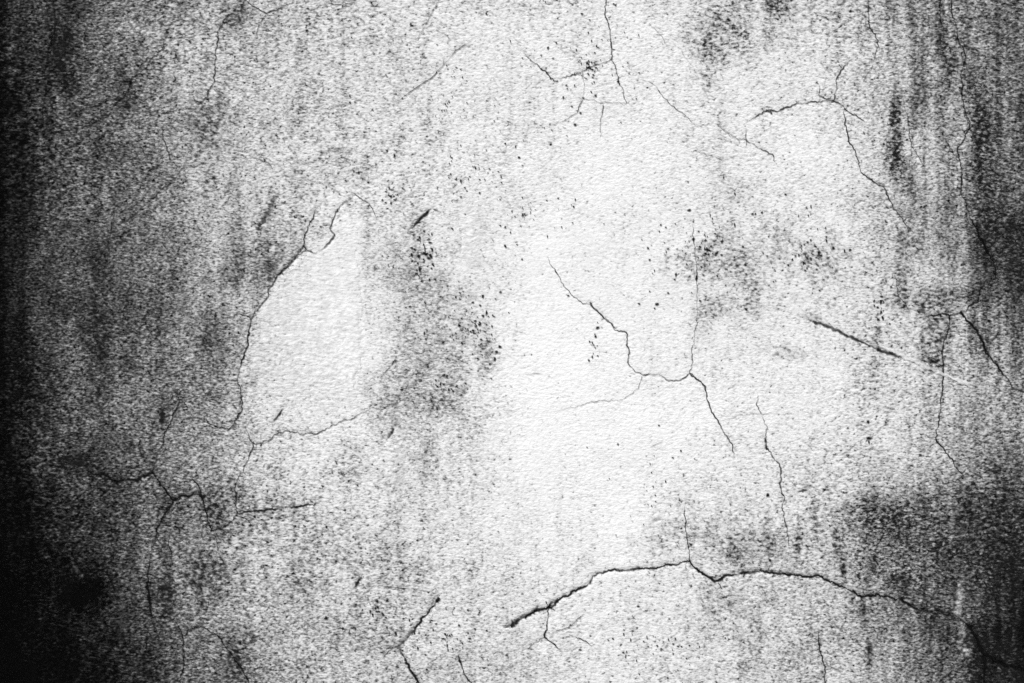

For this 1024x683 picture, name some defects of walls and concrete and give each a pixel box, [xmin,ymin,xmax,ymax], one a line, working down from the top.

crack [97,133,213,266]
crack [529,2,627,137]
crack [650,5,907,226]
crack [51,193,375,683]
crack [549,228,789,546]
crack [510,502,1024,683]